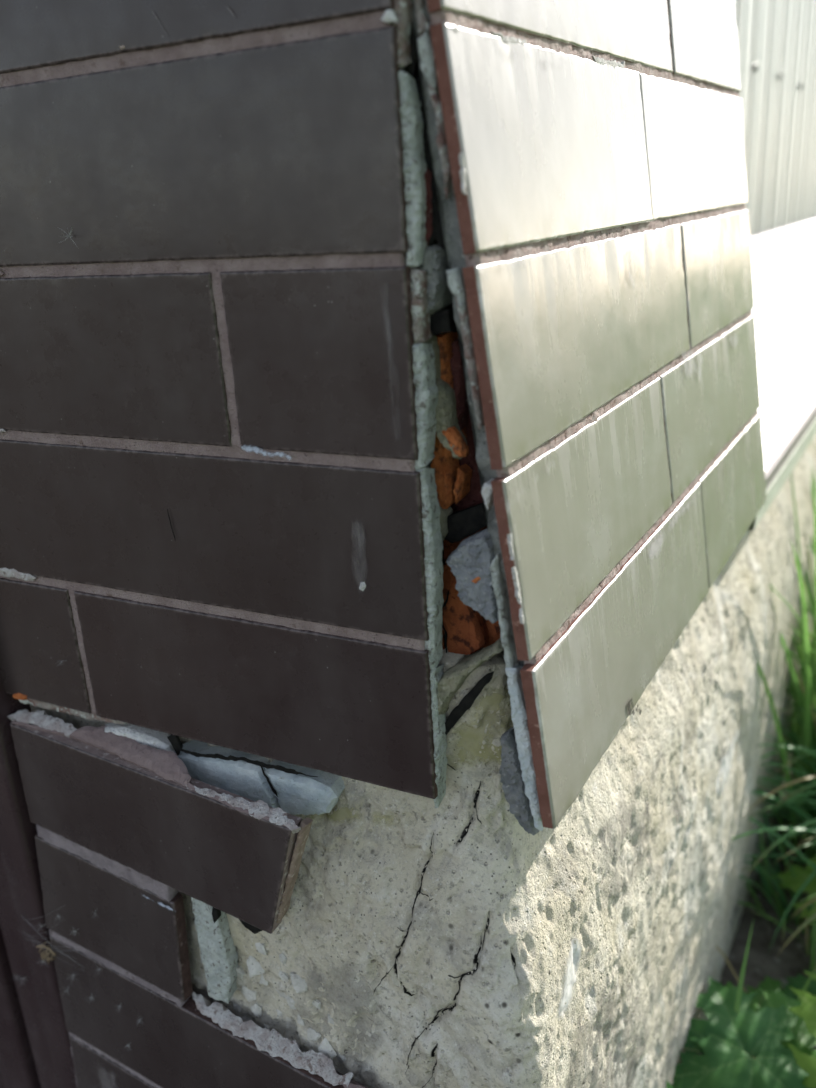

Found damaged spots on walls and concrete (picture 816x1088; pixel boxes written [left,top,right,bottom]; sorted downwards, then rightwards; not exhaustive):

crack [405,20,445,250]
peeling [459,152,467,195]
crack [430,308,457,334]
crack [445,503,487,543]
peeling [507,533,524,624]
crack [445,671,494,735]
crack [373,781,482,996]
spalling [223,942,346,1064]
crack [406,918,489,1088]